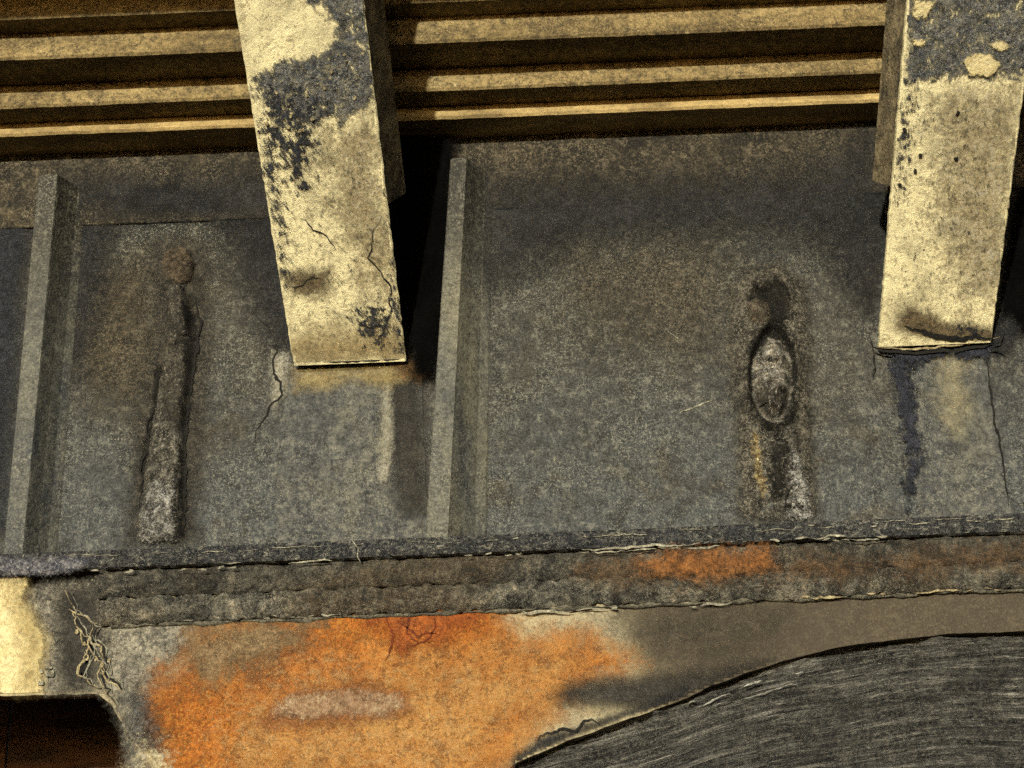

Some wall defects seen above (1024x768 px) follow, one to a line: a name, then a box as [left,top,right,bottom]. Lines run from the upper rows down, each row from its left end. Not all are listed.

crack [254,91,404,442]
crack [869,330,1009,505]
leakage [887,307,1017,514]
corrosion [649,550,772,575]
corrosion [148,610,629,768]